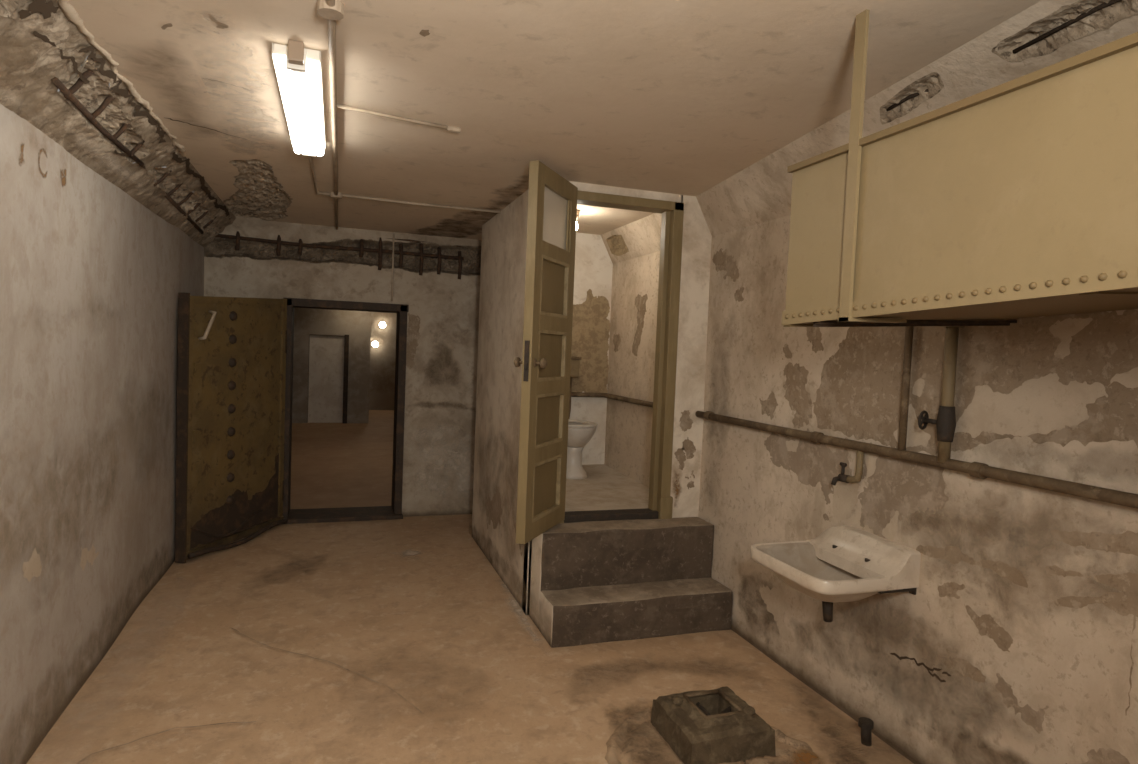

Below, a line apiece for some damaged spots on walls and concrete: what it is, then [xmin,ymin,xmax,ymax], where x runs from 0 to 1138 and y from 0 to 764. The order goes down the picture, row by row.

spalling [992,0,1138,63]
spalling [880,72,944,125]
spalling [0,0,481,279]
peeling [571,289,648,393]
peeling [674,410,696,489]
peeling [759,309,1138,542]
peeling [1051,529,1138,556]
peeling [938,582,1013,652]
peeling [1045,565,1138,617]
crack [890,653,951,682]
peeling [945,648,1049,734]
leakage [945,734,1023,764]